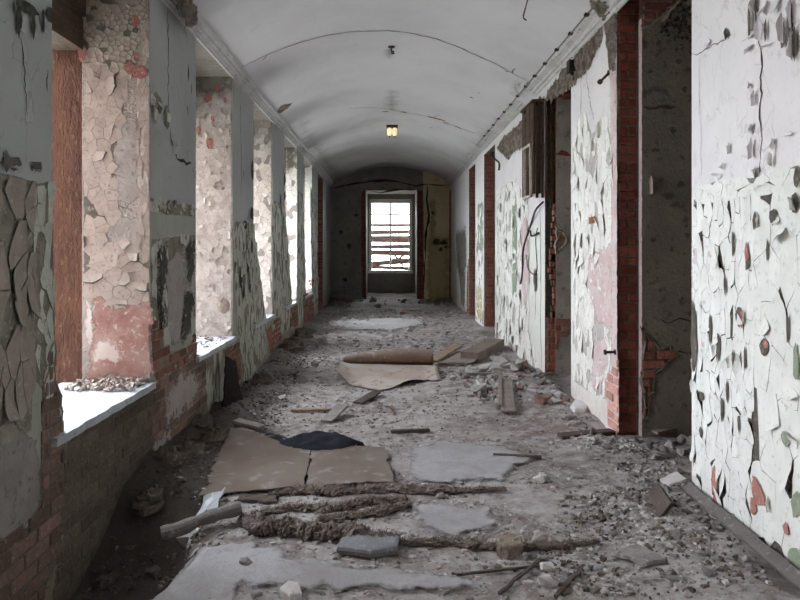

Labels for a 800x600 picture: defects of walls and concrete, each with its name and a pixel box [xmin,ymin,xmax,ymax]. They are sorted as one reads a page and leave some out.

peeling [0,0,323,600]
crack [167,11,192,111]
crack [170,132,196,176]
crack [249,30,526,81]
crack [333,179,445,282]
spalling [466,0,684,437]
crack [689,0,763,175]
peeling [680,131,800,570]